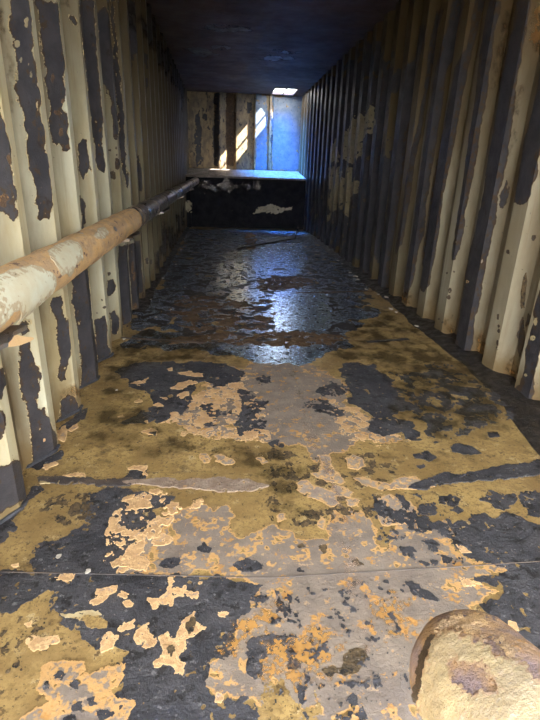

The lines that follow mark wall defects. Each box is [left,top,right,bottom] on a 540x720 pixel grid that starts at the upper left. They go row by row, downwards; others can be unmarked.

peeling [0,106,19,222]
peeling [7,0,143,222]
peeling [50,24,427,424]
peeling [404,0,501,298]
peeling [455,0,540,351]
peeling [0,319,88,543]
peeling [0,486,263,720]
peeling [125,465,148,479]
peeling [338,362,453,442]
peeling [450,443,482,455]
peeling [417,490,540,650]
peeling [516,273,540,399]